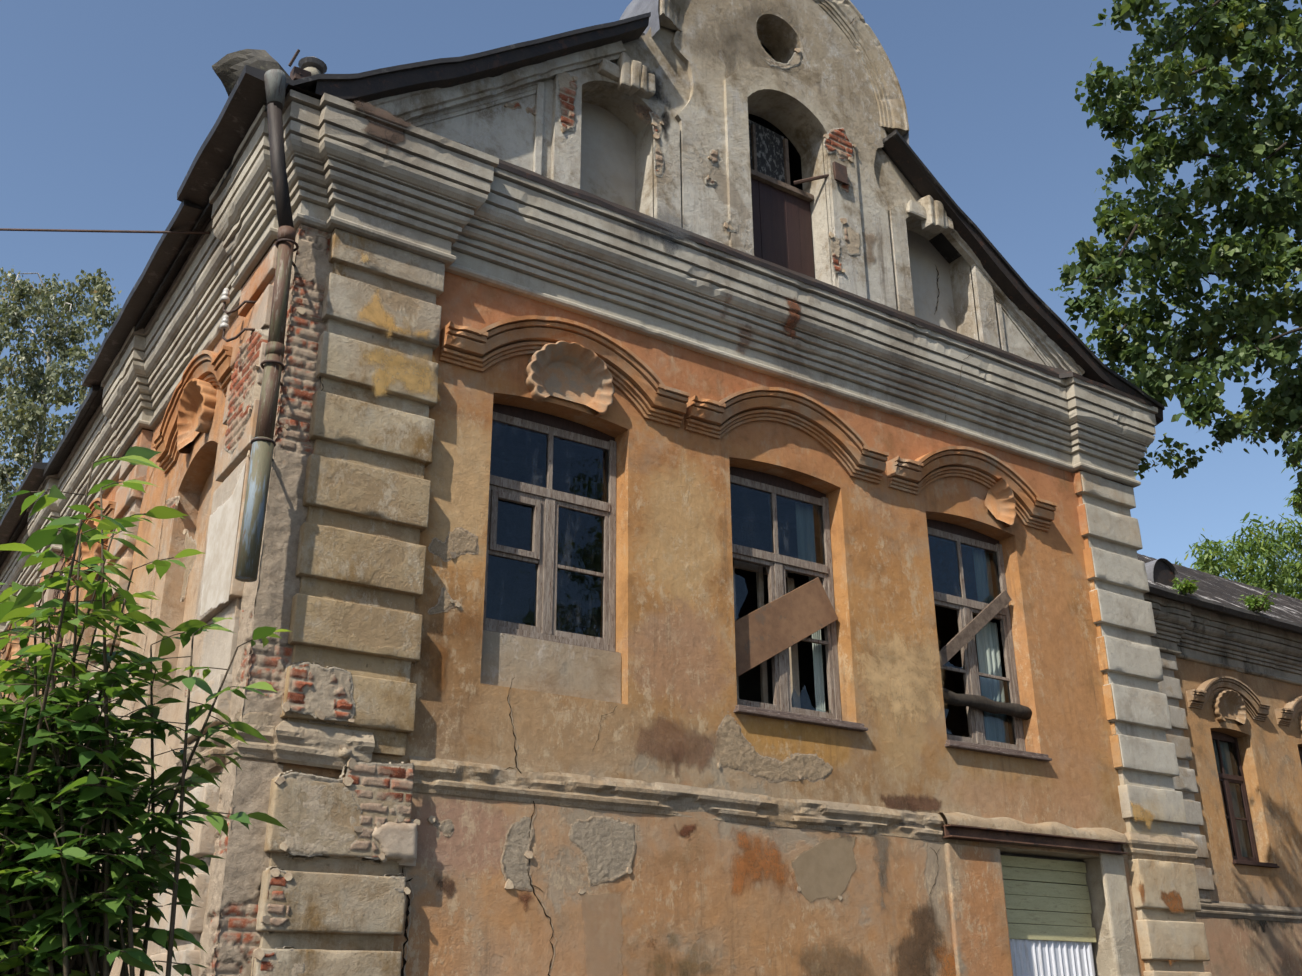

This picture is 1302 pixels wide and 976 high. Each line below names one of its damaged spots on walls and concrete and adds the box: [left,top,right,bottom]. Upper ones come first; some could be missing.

crack [505,677,557,976]